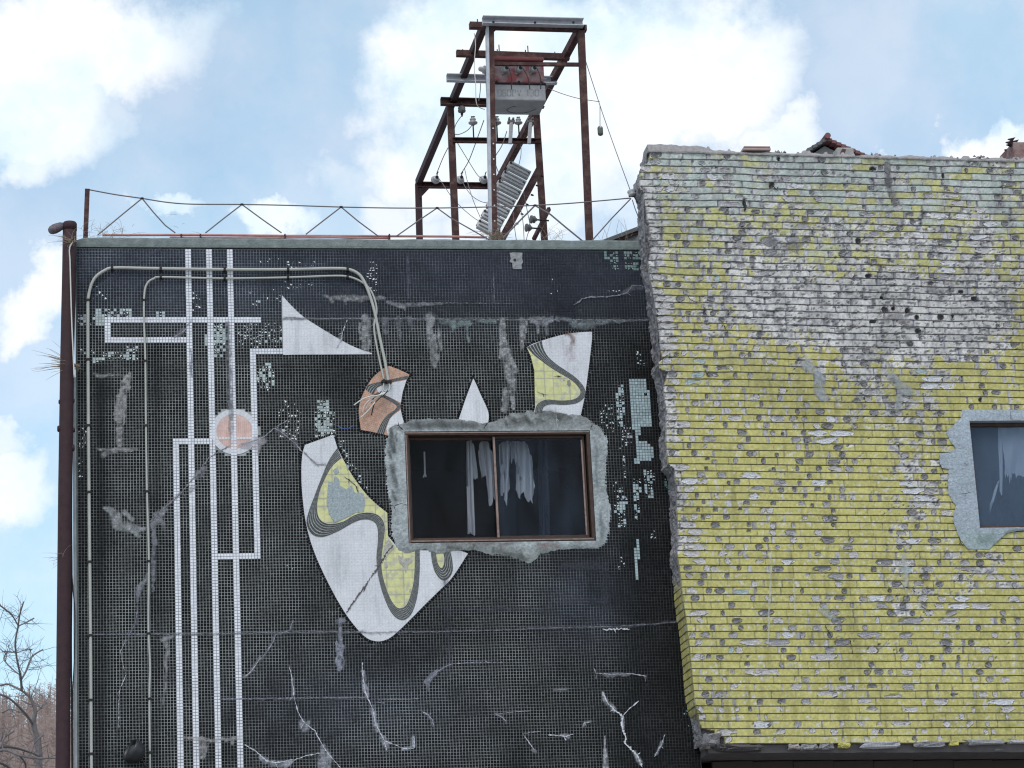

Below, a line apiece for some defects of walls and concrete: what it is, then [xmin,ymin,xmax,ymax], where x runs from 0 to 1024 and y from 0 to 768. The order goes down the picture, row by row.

spalling [641,153,675,192]
water stain [418,303,572,425]
spalling [601,161,1024,753]
crack [92,545,675,768]